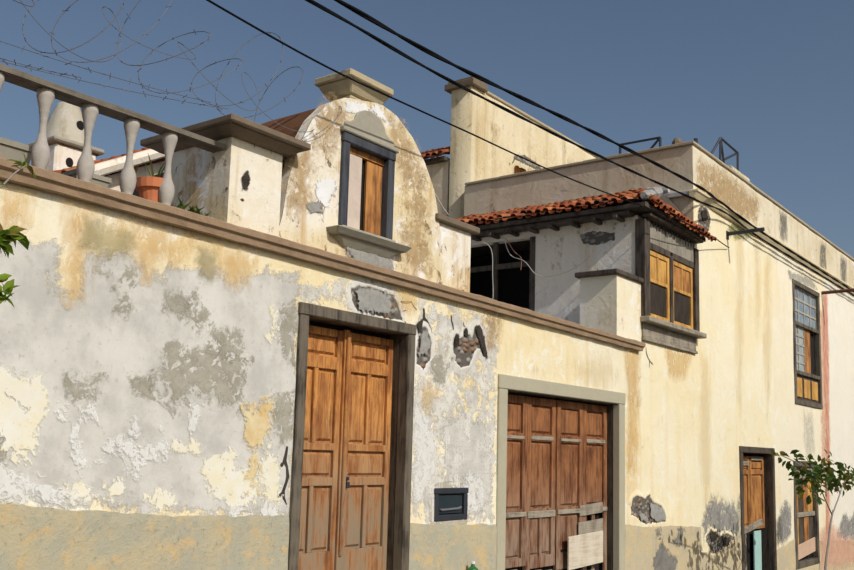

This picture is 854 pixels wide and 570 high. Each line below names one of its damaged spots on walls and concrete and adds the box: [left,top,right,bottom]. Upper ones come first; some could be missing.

flaking render [236,170,250,202]
damp [81,220,134,278]
damp [112,268,138,313]
damp [199,247,216,279]
flaking render [578,228,618,249]
damp [788,270,817,289]
damp [64,373,105,402]
peeling [0,238,406,517]
damp [129,290,298,496]
peeling [411,299,499,525]
flaking render [628,488,685,570]
flaking render [703,525,736,555]